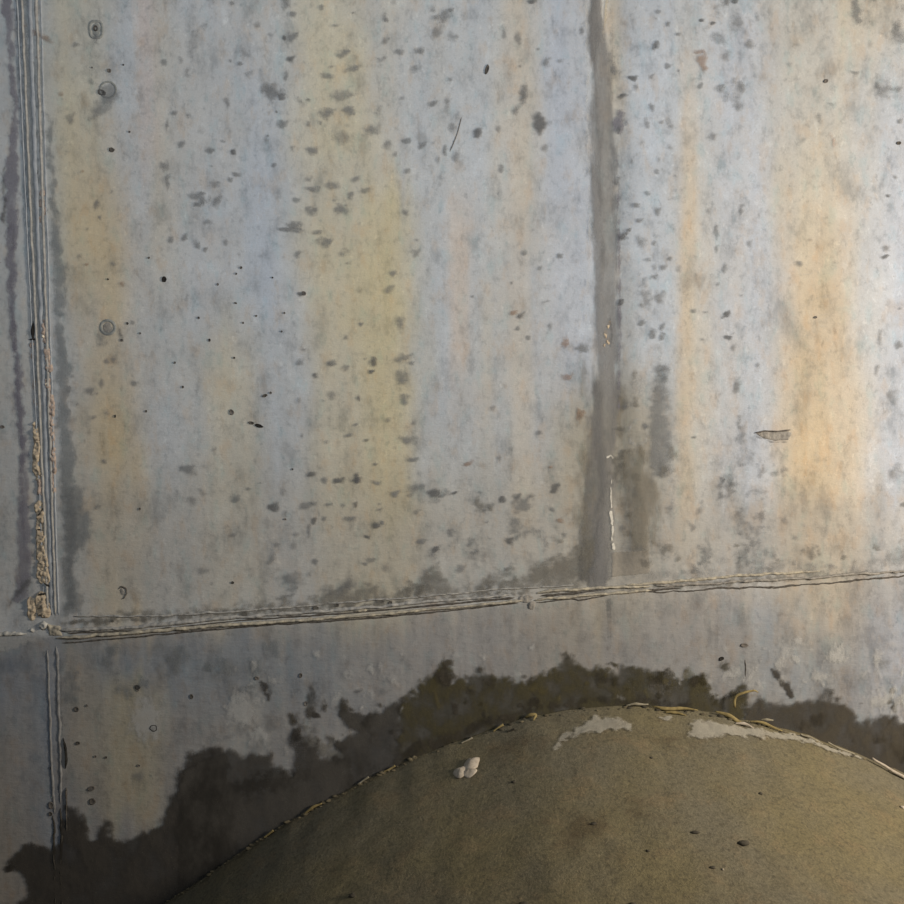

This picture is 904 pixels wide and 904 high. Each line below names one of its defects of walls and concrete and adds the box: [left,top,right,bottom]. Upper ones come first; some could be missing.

leakage [1,65,19,293]
leakage [530,0,641,592]
leakage [10,319,28,471]
crack [64,589,608,643]
crack [648,575,904,593]
leakage [6,686,403,904]
leakage [555,715,631,749]
leakage [690,669,904,773]